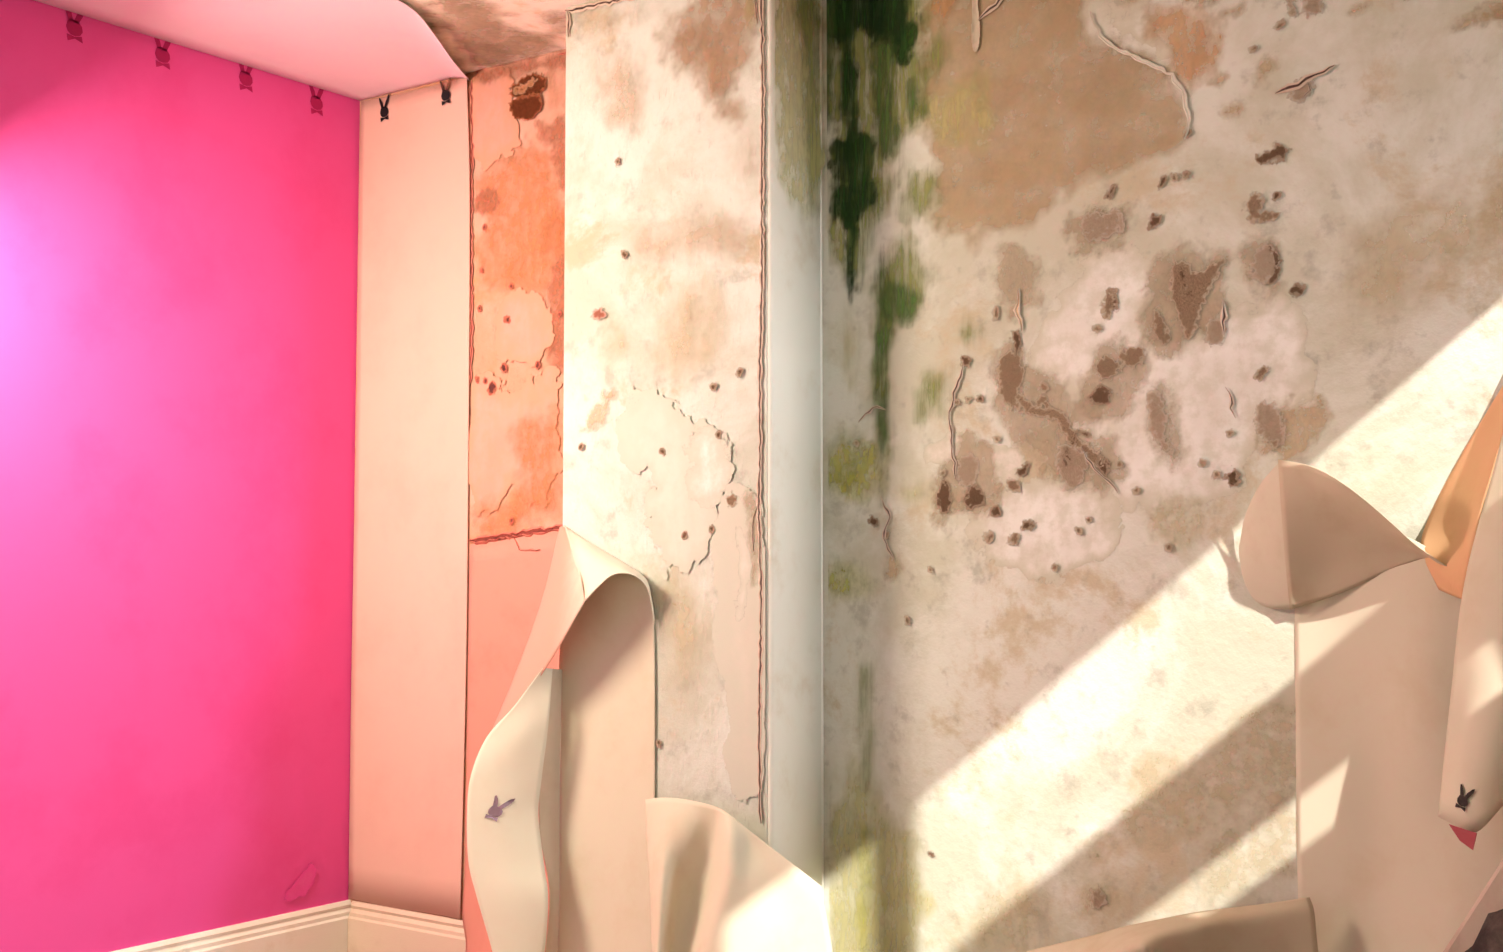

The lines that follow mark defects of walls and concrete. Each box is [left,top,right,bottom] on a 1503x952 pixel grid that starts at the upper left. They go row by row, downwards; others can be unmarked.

water stain [428,0,566,82]
peeling [467,65,546,171]
water stain [536,117,565,188]
water stain [676,0,758,93]
crack [978,0,1002,21]
crack [1090,12,1191,139]
flaking render [1157,169,1192,188]
water stain [775,0,967,495]
water stain [548,260,564,368]
water stain [995,245,1224,490]